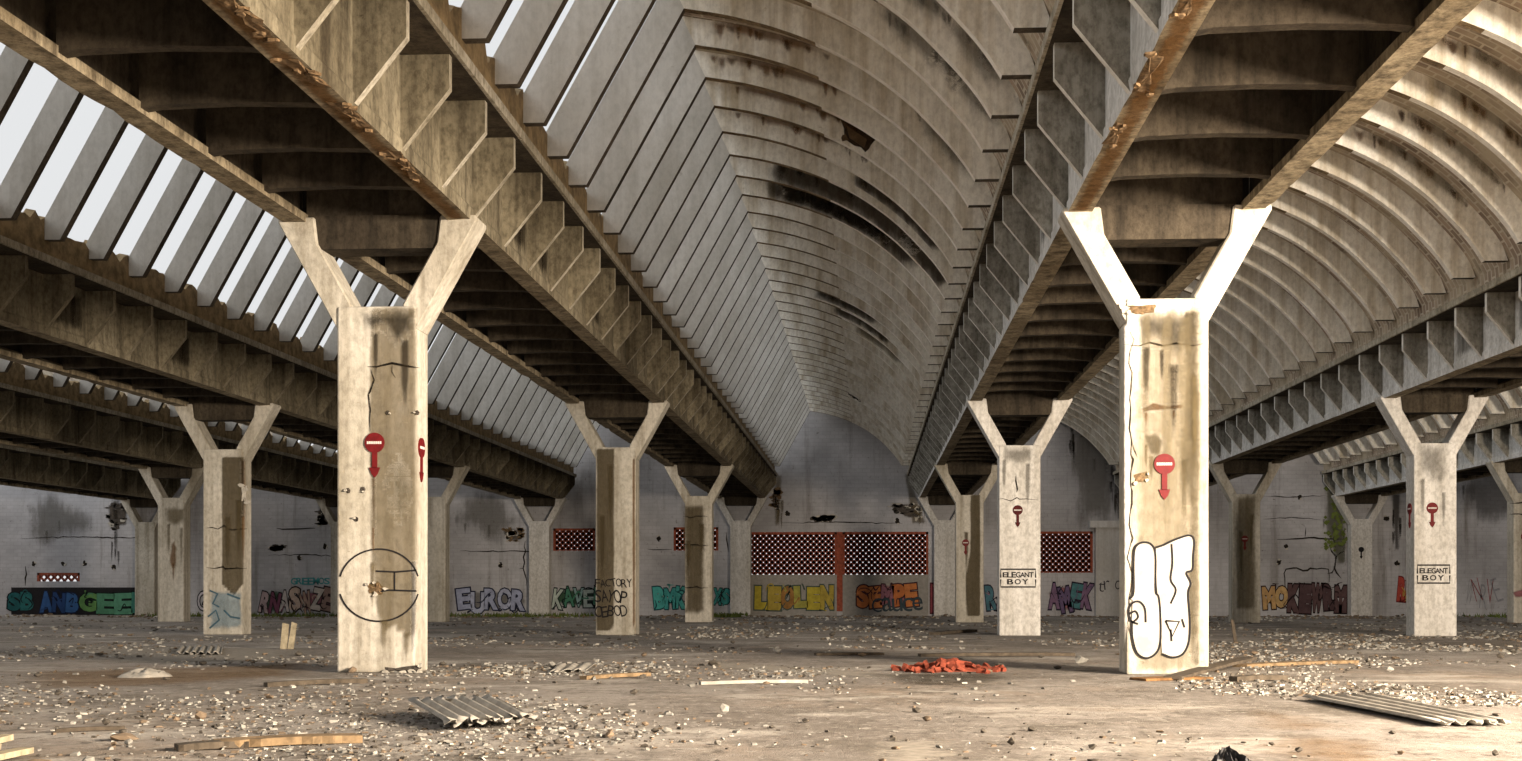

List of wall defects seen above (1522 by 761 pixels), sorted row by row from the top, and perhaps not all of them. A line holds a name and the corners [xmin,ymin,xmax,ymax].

spalling [839,118,875,152]
water stain [769,165,945,285]
water stain [818,291,897,360]
water stain [371,308,417,650]